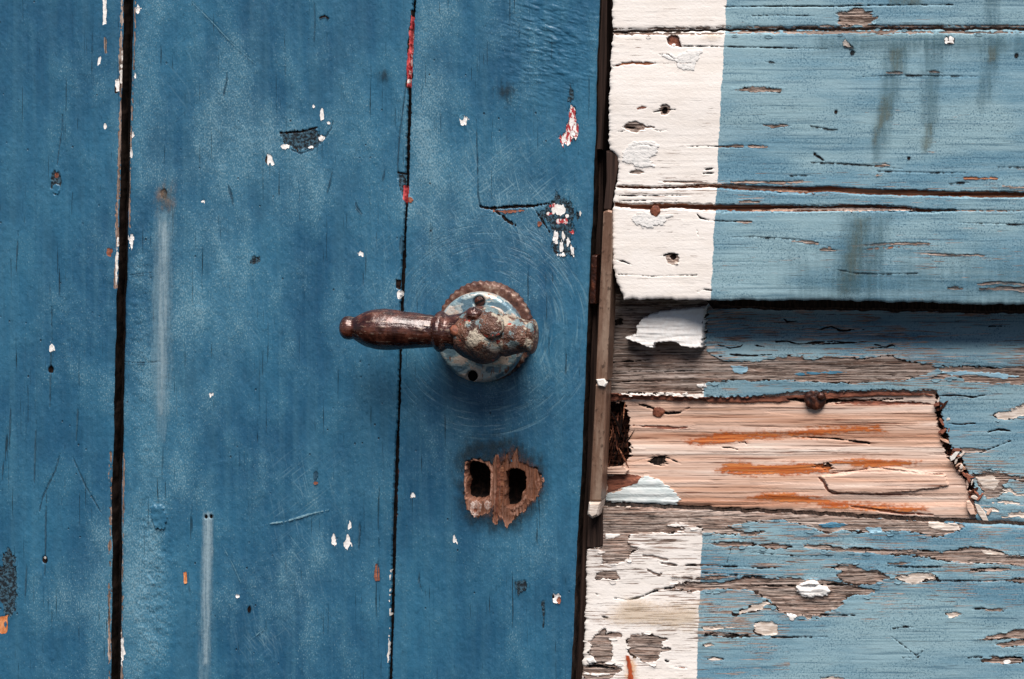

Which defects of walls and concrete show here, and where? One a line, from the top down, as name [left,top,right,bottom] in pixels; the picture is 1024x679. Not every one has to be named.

peeling [279,105,333,154]
peeling [559,84,579,150]
crack [476,130,550,232]
peeling [538,190,581,257]
peeling [607,293,1024,398]
peeling [822,467,948,494]
peeling [590,468,1024,664]
peeling [582,629,671,679]